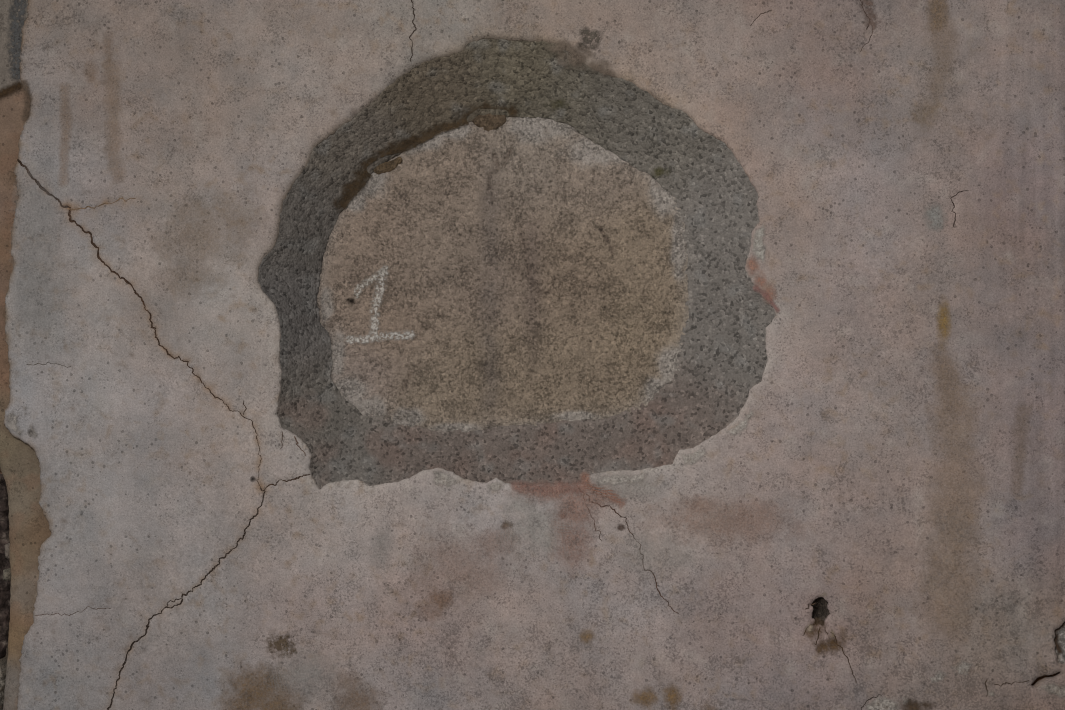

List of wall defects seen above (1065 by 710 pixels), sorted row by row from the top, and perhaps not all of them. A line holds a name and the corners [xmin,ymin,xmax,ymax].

water stain [9,0,27,79]
crack [408,0,416,61]
spalling [258,39,776,489]
crack [17,159,310,710]
crack [577,485,679,614]
spalling [1031,622,1065,685]